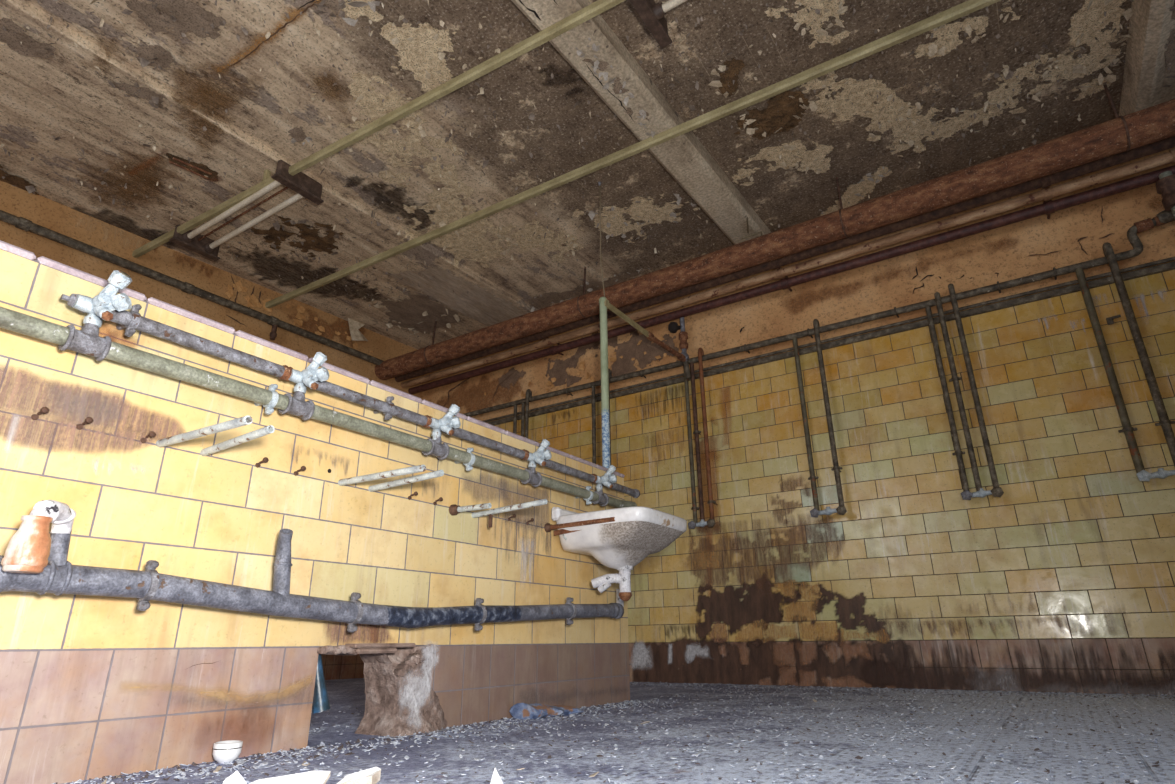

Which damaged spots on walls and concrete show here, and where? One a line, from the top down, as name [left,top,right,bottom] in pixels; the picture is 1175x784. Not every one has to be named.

damp [73,155,173,252]
peeling [620,0,1134,216]
damp [0,368,182,451]
damp [632,480,1175,695]